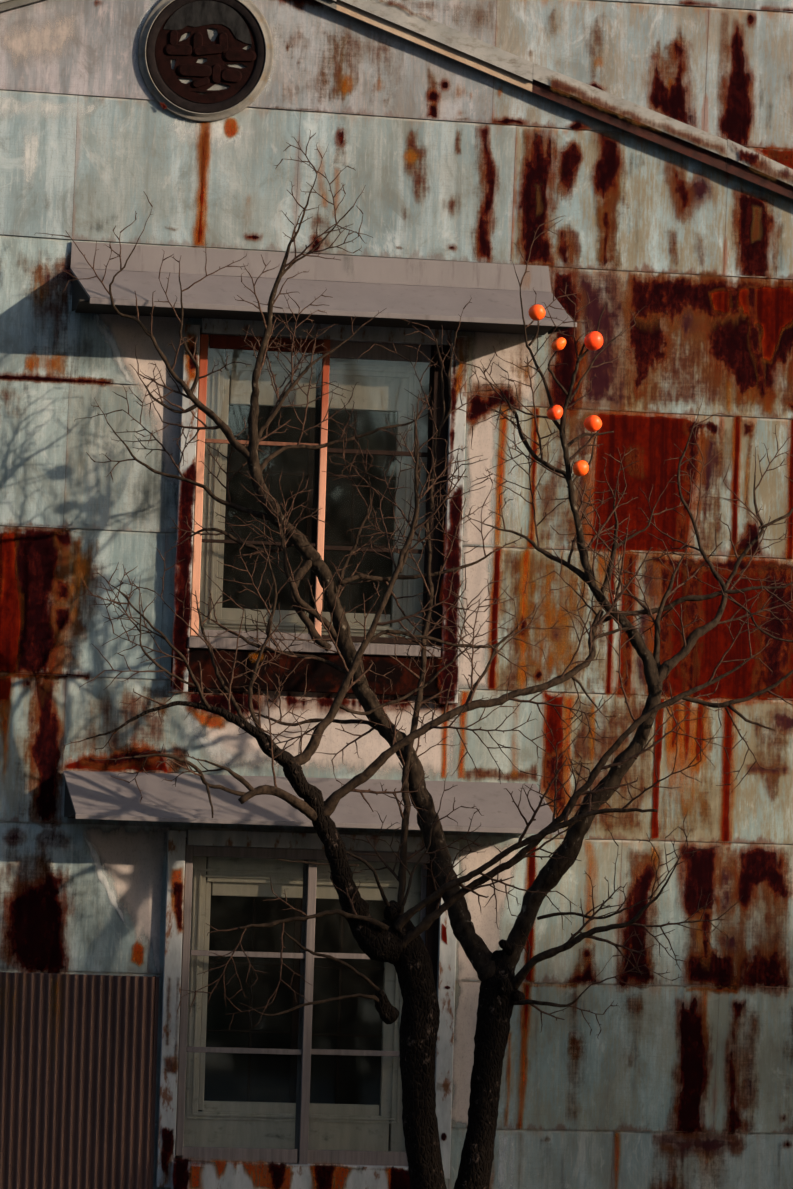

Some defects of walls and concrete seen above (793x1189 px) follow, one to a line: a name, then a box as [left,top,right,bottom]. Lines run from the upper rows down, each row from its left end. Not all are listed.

rust [194,122,210,247]
rust [224,118,238,137]
rust [551,12,793,180]
rust [441,126,793,1189]
rust [0,524,188,974]